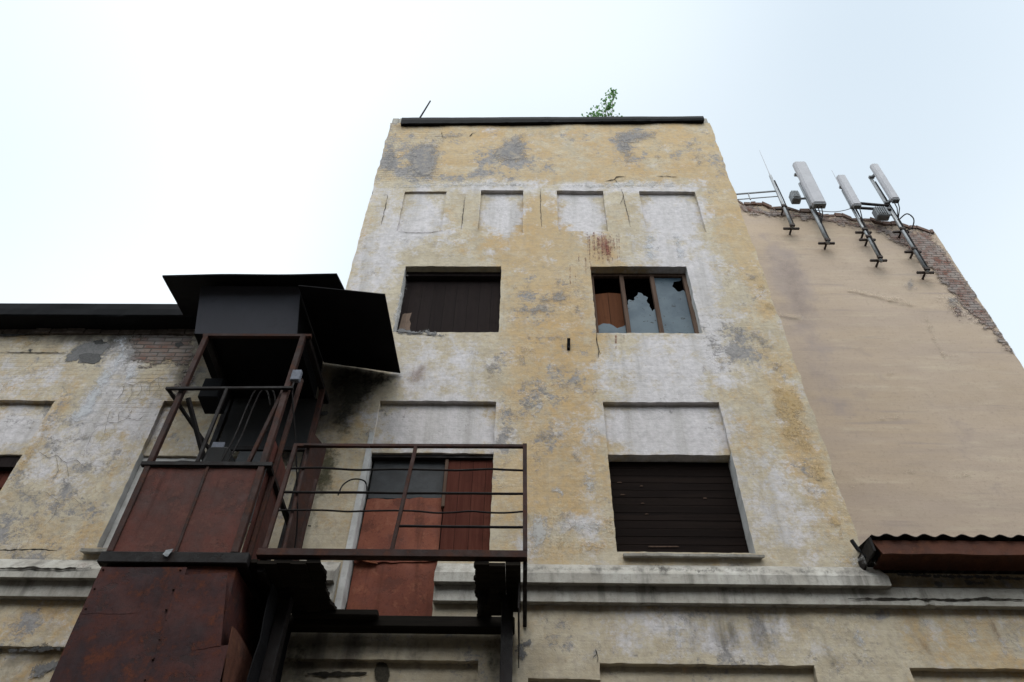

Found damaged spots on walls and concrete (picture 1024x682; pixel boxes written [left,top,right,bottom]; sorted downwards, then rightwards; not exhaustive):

spalling [65,332,110,364]
flaking render [118,331,196,396]
flaking render [740,205,1015,354]
crack [38,377,163,523]